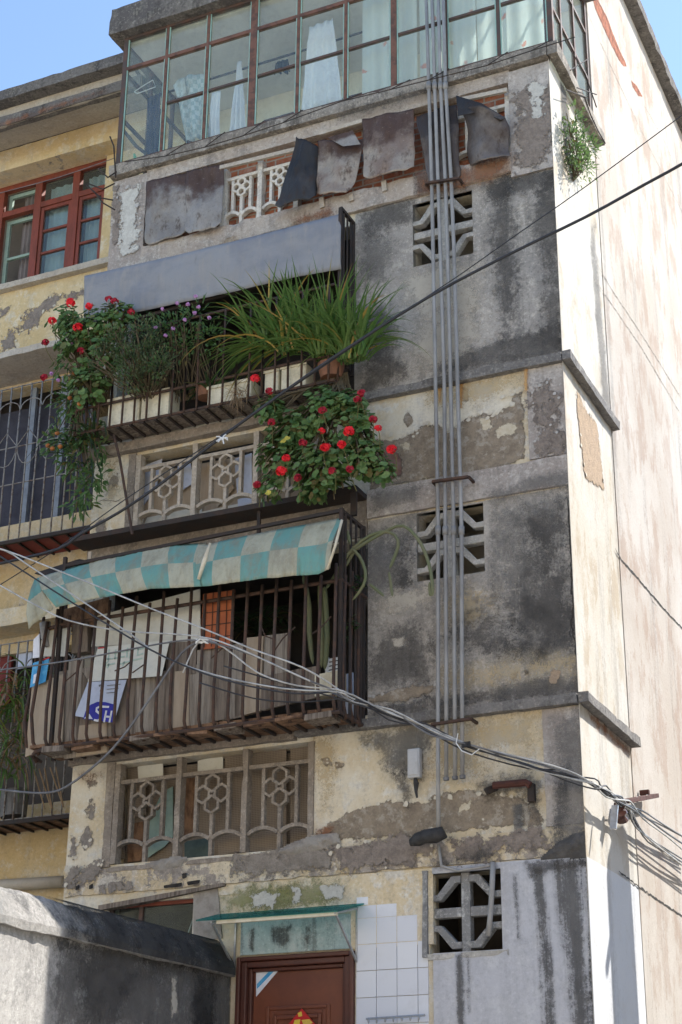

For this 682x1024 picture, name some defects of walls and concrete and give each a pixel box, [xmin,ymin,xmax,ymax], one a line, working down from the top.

peeling [509,80,552,176]
peeling [110,184,142,259]
peeling [0,287,84,352]
water stain [361,169,562,392]
peeling [370,378,567,490]
peeling [576,391,605,489]
water stain [359,472,578,808]
peeling [62,773,133,895]
peeling [229,788,554,881]
water stain [525,859,594,1024]